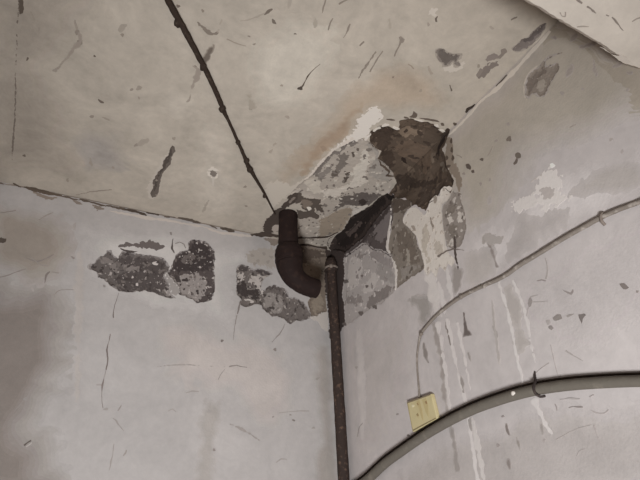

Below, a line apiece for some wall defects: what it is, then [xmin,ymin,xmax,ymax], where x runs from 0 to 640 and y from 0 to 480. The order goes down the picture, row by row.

spalling [435,48,463,68]
spalling [476,23,547,79]
spalling [525,53,561,99]
damp [273,59,456,186]
peeling [150,146,175,198]
crack [52,192,179,219]
flaking render [236,106,475,325]
spalling [89,239,215,303]
damp [345,207,570,456]